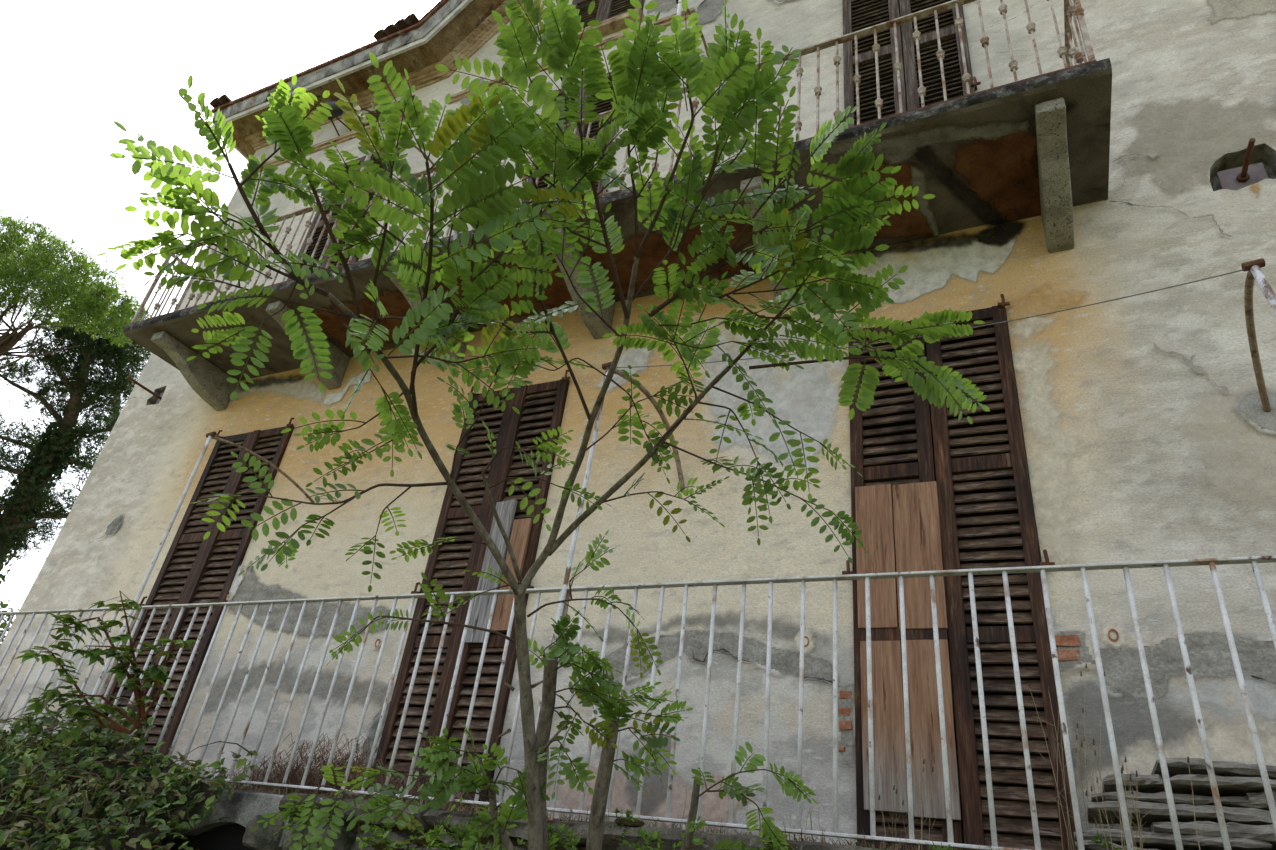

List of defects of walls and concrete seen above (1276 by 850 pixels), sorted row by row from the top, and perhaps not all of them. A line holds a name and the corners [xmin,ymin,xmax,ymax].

spalling [696,0,725,24]
leakage [1123,100,1276,193]
peeling [851,234,1018,303]
peeling [705,319,844,470]